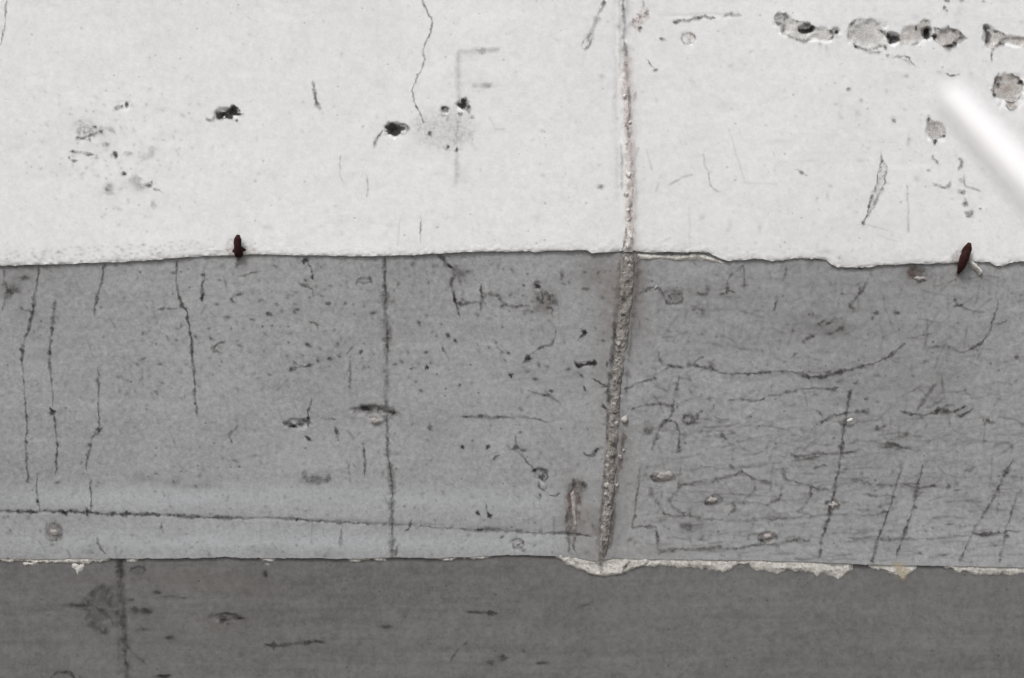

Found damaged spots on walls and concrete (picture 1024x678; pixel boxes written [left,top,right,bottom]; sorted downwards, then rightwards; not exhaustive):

spalling [775,12,839,39]
spalling [877,20,962,50]
spalling [992,74,1023,108]
hole [209,105,241,121]
hole [374,123,408,143]
crack [440,257,522,314]
crack [7,269,239,519]
crack [584,343,905,552]
crack [977,465,1012,536]
peeling [555,479,853,580]
peeling [868,565,917,579]
peeling [944,566,1024,576]